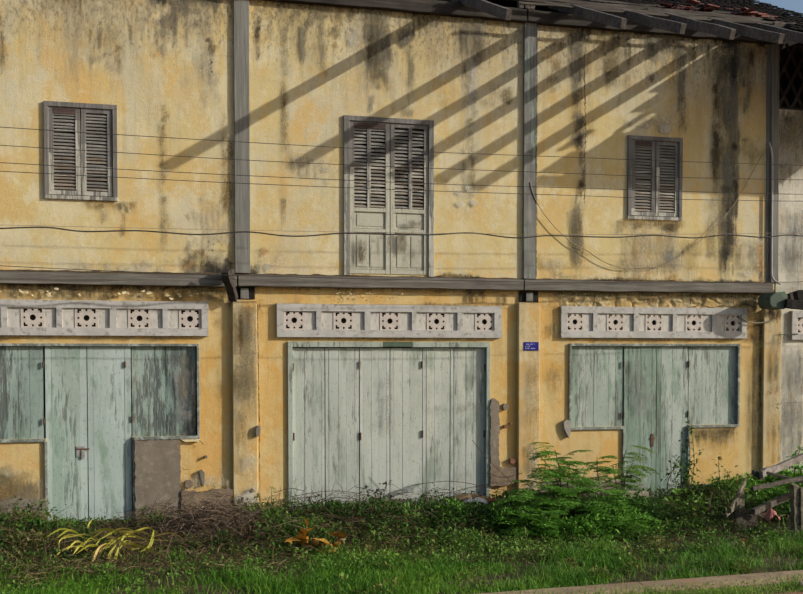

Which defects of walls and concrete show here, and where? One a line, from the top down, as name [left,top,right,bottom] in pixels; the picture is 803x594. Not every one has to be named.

damp [292,3,444,88]
damp [553,27,591,148]
damp [648,34,698,129]
damp [707,39,766,282]
damp [571,205,583,262]
damp [590,219,709,282]
damp [543,291,756,305]
damp [227,297,260,399]
damp [753,352,761,444]